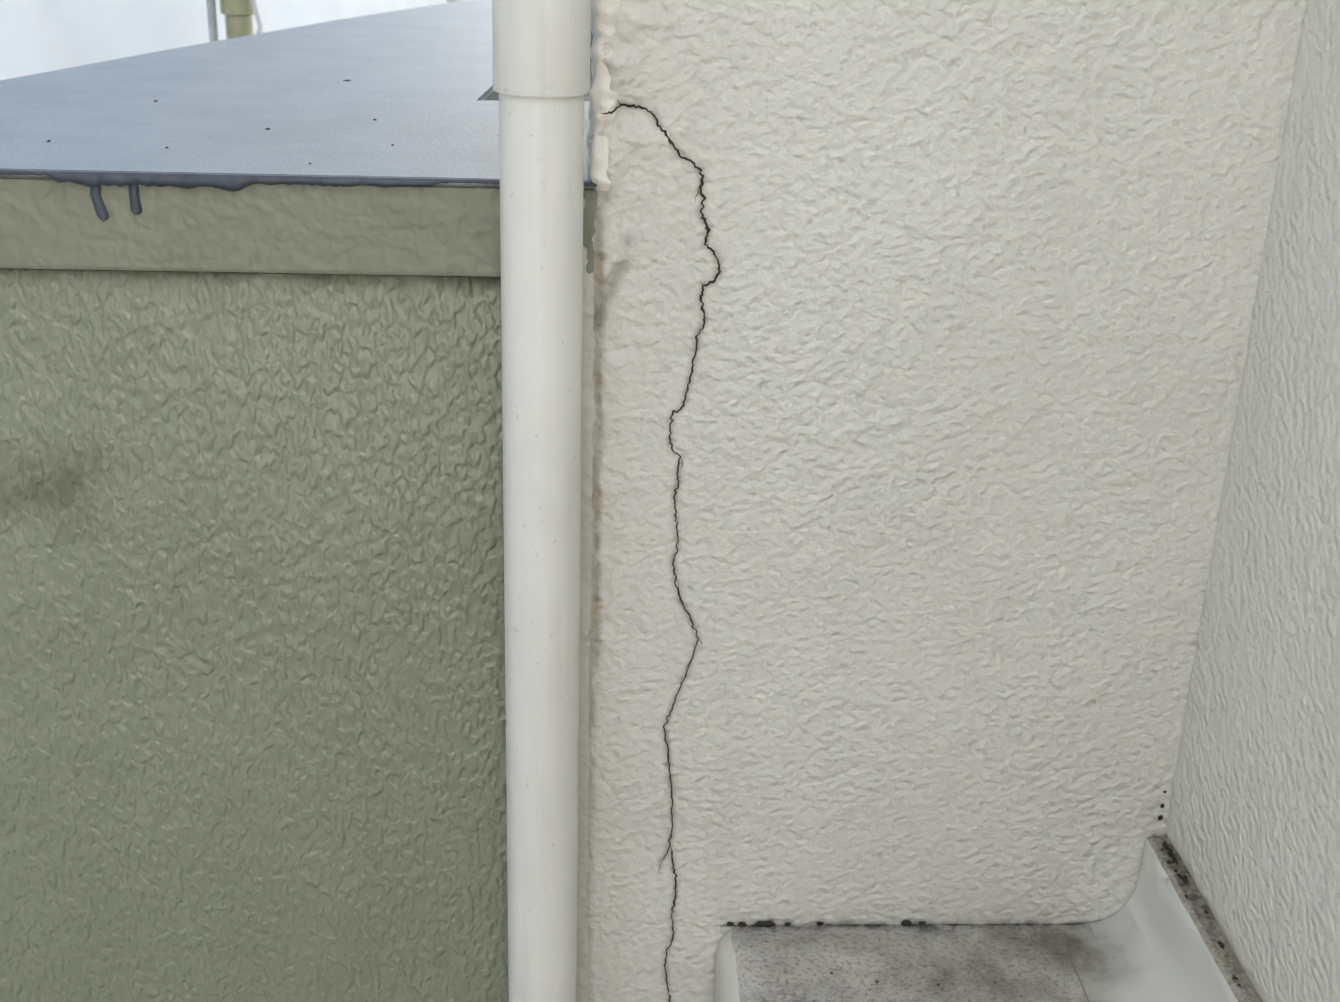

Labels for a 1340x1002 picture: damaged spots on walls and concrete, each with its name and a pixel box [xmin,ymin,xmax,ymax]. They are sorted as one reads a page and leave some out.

crack [602,100,721,1002]
leakage [727,921,791,929]
leakage [901,920,958,928]
mould [1152,790,1224,949]